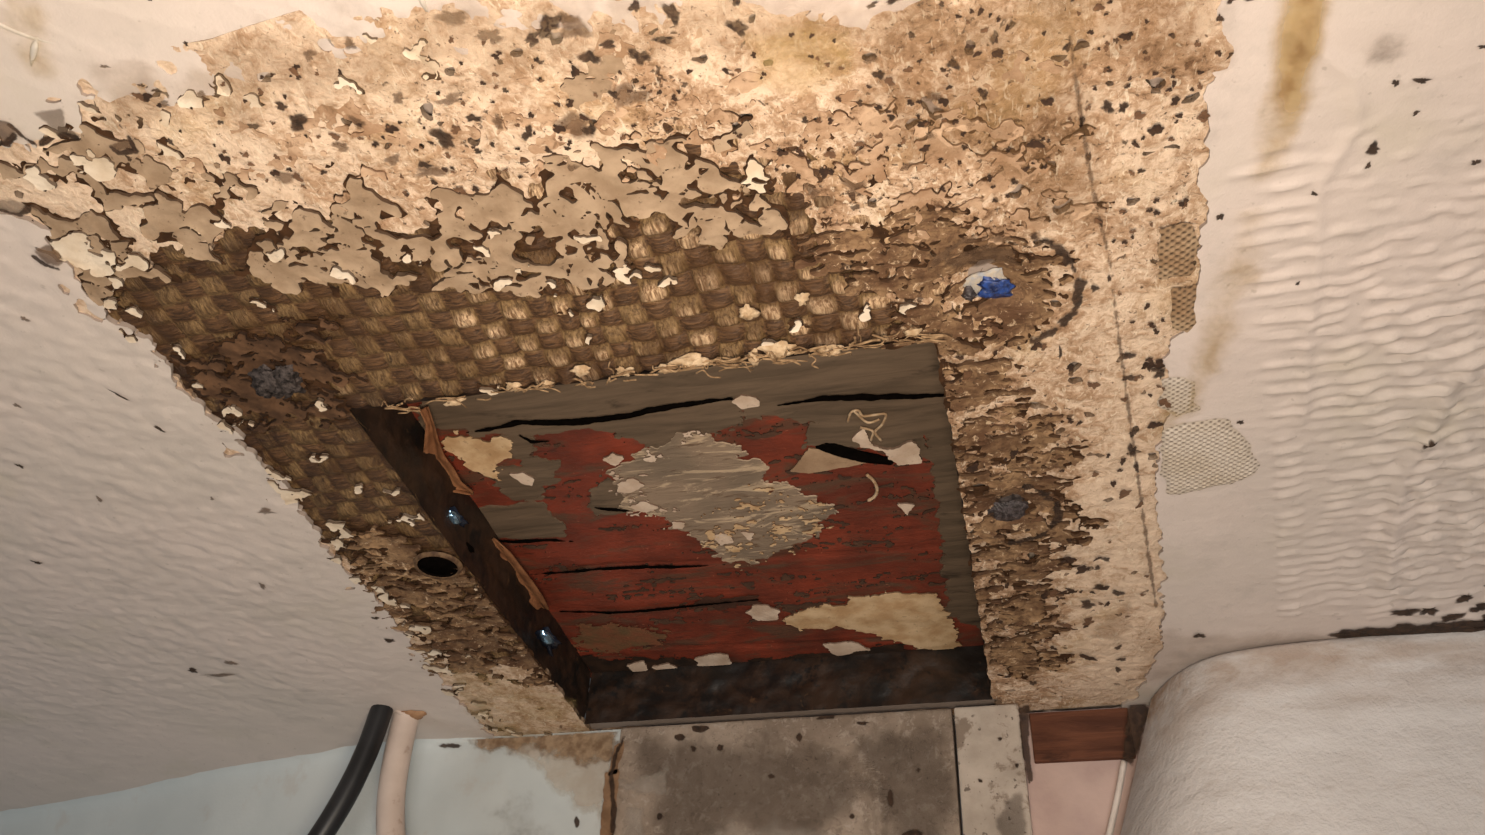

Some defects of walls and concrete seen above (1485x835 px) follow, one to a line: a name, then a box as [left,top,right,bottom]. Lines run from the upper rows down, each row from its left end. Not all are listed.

leakage [1392,78,1431,87]
leakage [1365,141,1380,169]
peeling [0,0,1234,711]
peeling [1391,585,1485,622]
peeling [319,520,643,805]
leakage [674,726,709,752]